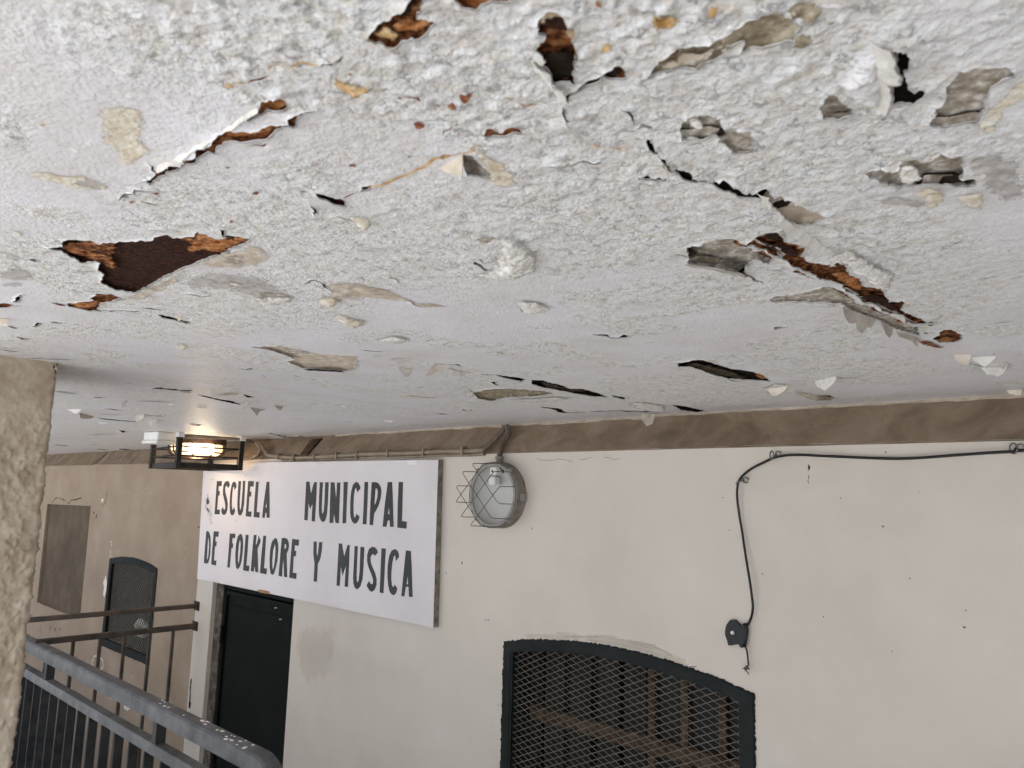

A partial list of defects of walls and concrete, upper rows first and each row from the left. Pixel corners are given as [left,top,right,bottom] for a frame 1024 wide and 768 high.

rust [533,12,626,103]
crack [503,94,791,210]
peeling [680,116,753,153]
peeling [650,2,834,76]
peeling [820,95,852,119]
peeling [872,43,925,116]
peeling [867,154,1024,210]
peeling [930,67,1024,133]
rust [51,220,250,311]
peeling [686,239,786,281]
peeling [771,286,940,348]
rust [915,322,962,342]